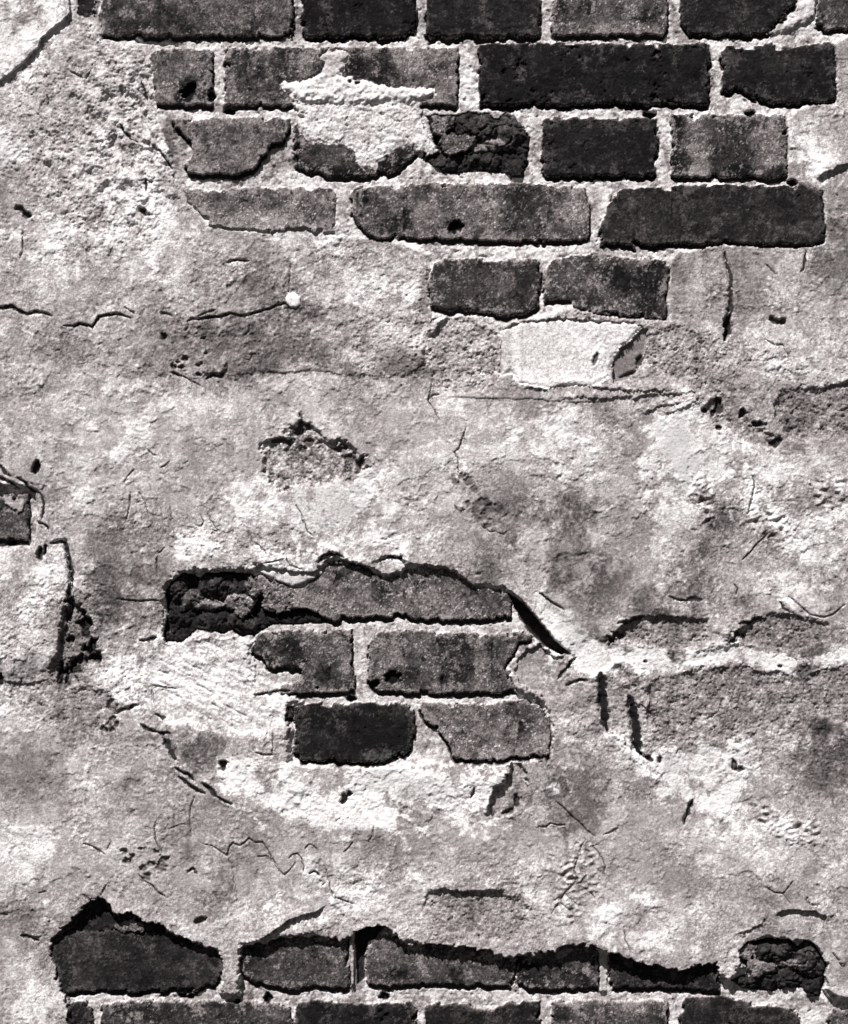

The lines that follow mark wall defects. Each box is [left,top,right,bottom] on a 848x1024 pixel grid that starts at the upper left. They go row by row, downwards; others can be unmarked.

flaking render [0,0,848,449]
crack [0,304,134,329]
crack [725,256,735,320]
flaking render [259,417,368,494]
flaking render [0,480,42,554]
crack [780,598,843,618]
flaking render [148,551,576,822]
crack [557,658,652,758]
crack [107,685,350,903]
flaking render [45,831,848,1024]